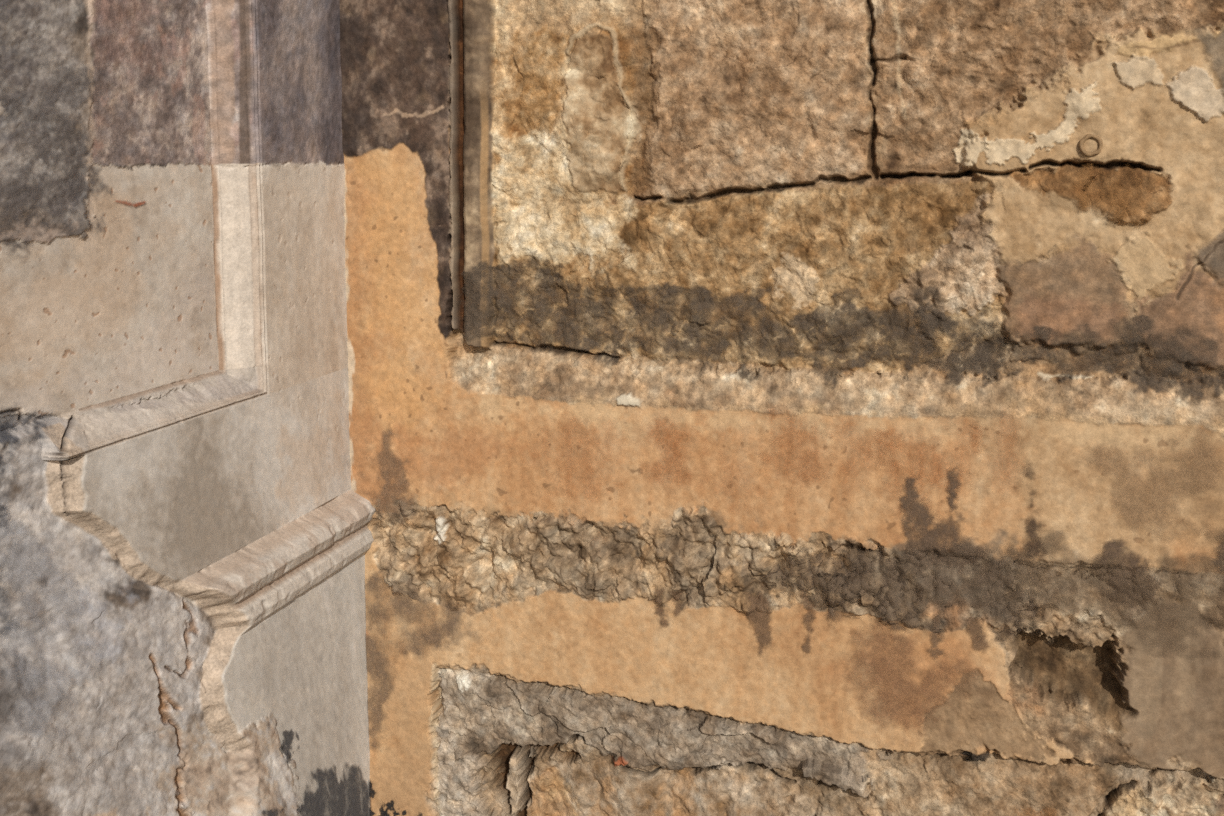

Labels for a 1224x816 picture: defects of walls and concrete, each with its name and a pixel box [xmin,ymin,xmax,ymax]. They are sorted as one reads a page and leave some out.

crack [634,0,1028,204]
peeling [1113,54,1224,122]
spalling [953,81,1173,224]
water stain [916,287,1002,364]
crack [0,408,23,420]
peeling [434,516,449,544]
water stain [654,590,683,626]
water stain [745,593,771,653]
water stain [768,472,1224,721]
crack [149,599,199,816]
peeling [456,673,472,693]
spalling [494,743,579,816]